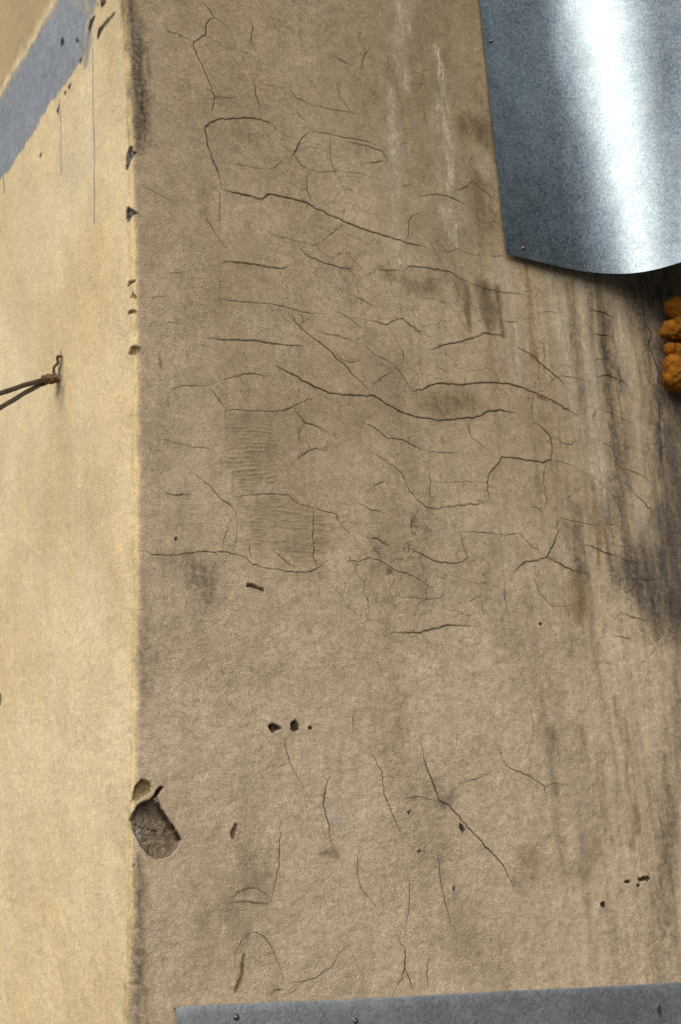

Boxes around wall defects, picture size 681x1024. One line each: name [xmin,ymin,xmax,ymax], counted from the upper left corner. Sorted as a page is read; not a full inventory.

spalling [126,147,136,170]
crack [165,3,514,294]
crack [140,296,662,634]
water stain [545,266,681,625]
spalling [130,780,180,860]
crack [234,830,281,903]
crack [414,749,511,880]
crack [396,938,429,987]